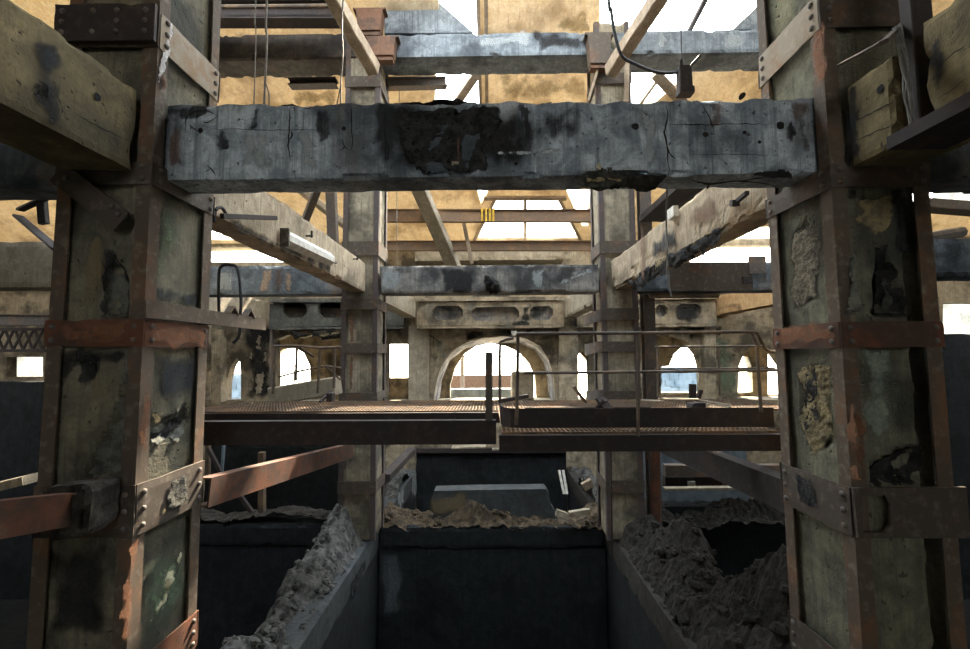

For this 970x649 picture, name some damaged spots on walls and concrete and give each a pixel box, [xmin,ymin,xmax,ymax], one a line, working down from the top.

water stain [33,42,61,124]
spalling [395,105,501,175]
spalling [576,163,667,192]
crack [663,106,776,224]
spalling [484,275,502,295]
spalling [628,228,721,290]
corrosion [154,327,206,348]
corrosion [781,323,834,344]
spalling [150,403,189,444]
spalling [797,362,836,454]
spalling [869,444,923,487]
corrosion [120,578,132,639]